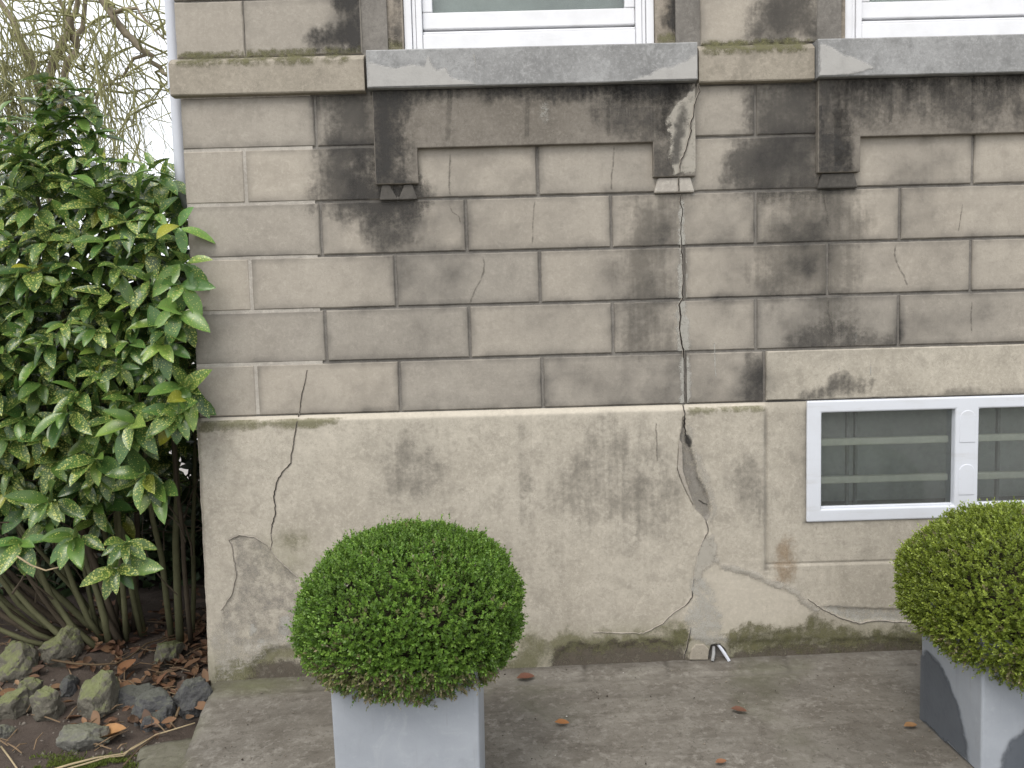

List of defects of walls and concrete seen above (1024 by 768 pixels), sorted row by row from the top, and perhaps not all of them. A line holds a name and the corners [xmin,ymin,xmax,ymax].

damp [321,95,422,214]
peeling [634,55,697,174]
damp [750,86,852,172]
crack [678,83,701,436]
crack [221,370,308,611]
spalling [678,420,709,521]
peeling [211,545,293,681]
crack [593,519,709,659]
crack [808,599,911,624]